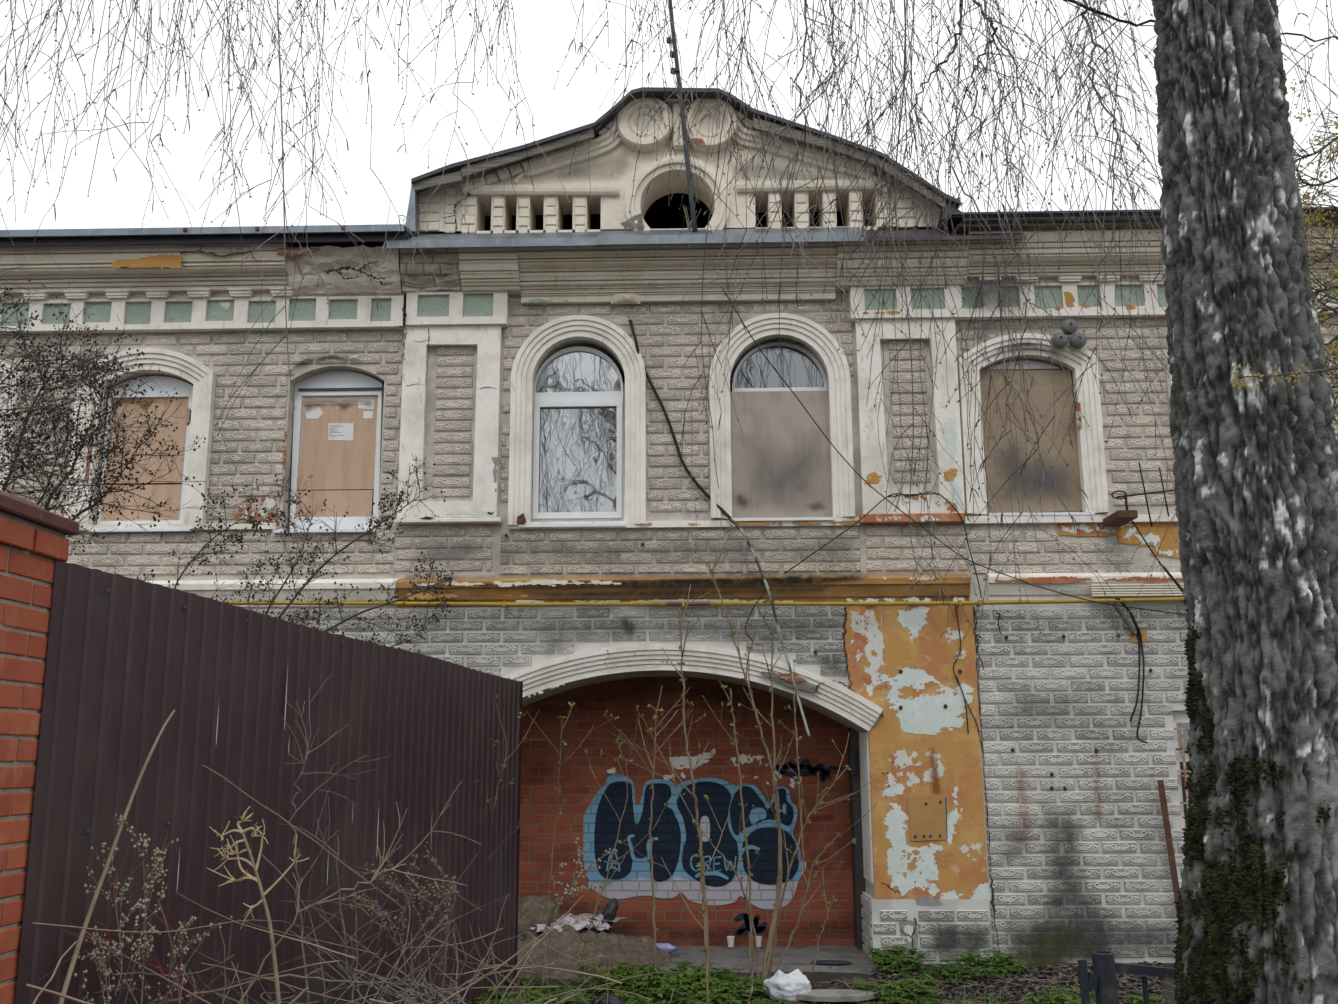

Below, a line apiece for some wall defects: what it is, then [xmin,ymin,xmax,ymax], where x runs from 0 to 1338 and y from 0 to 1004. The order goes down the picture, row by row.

peeling [111,244,255,268]
crack [323,261,430,386]
peeling [1057,522,1180,558]
peeling [407,579,793,602]
peeling [994,576,1182,592]
peeling [846,597,992,906]
water stain [1016,820,1158,958]
spalling [899,920,918,950]